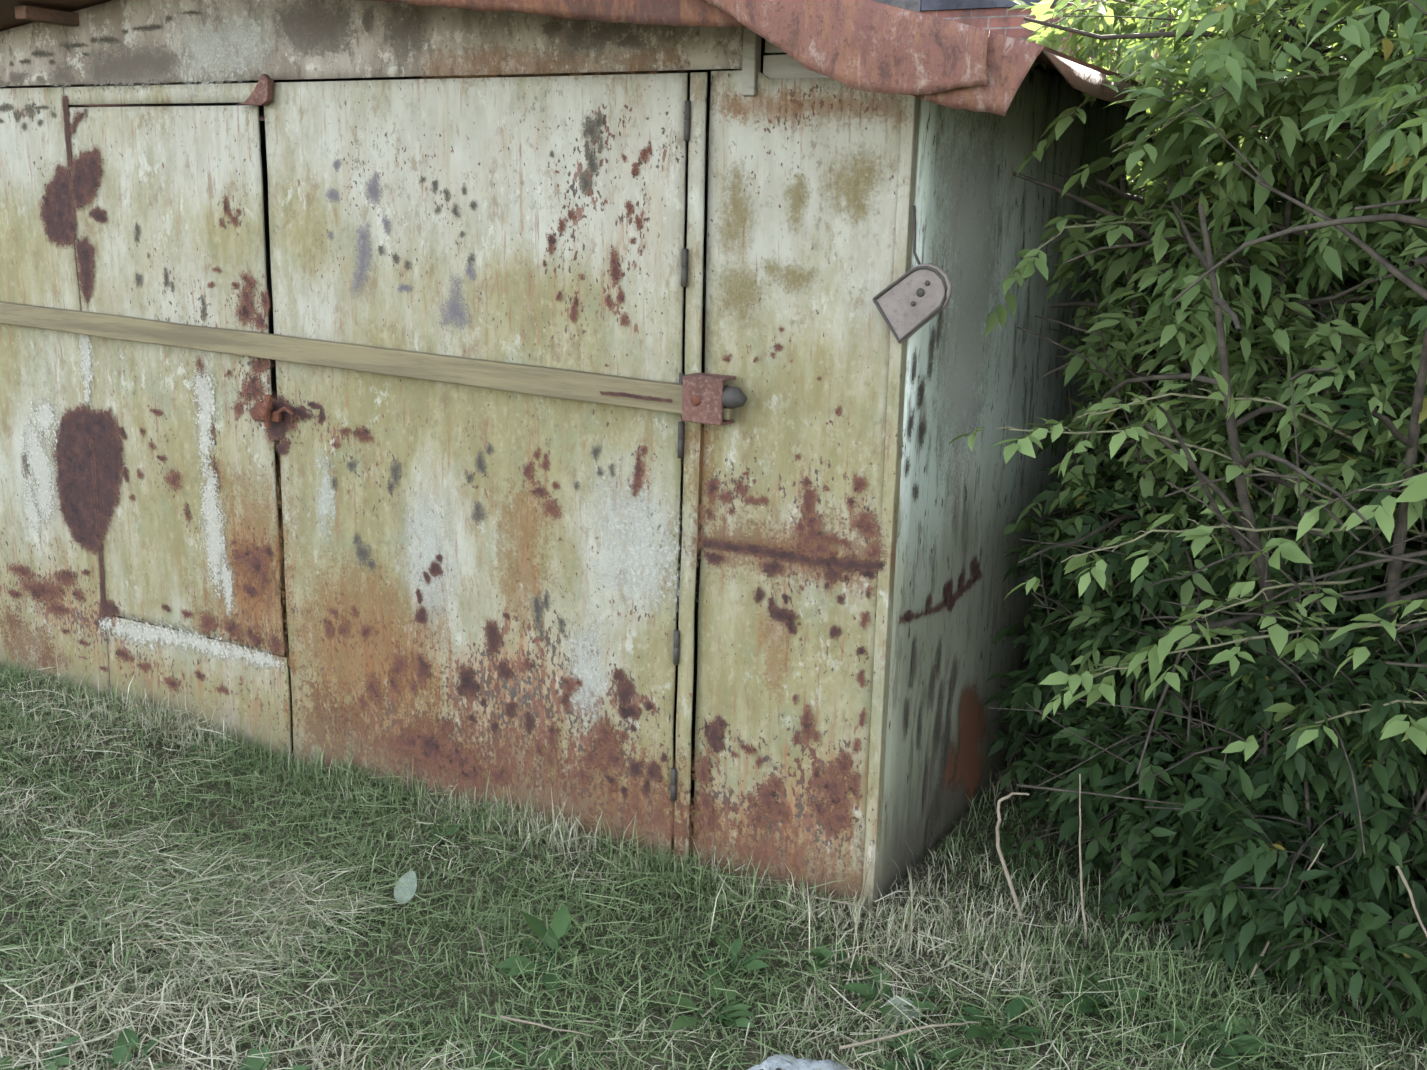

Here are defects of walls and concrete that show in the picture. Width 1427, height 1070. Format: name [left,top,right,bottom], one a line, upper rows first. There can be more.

rust [621,145,652,178]
rust [543,210,576,267]
rust [625,201,642,244]
rust [226,357,325,455]
rust [331,425,373,488]
rust [415,554,443,624]
rust [698,471,885,688]
rust [899,556,982,624]
rust [485,613,533,680]
rust [392,664,582,791]
rust [576,668,667,799]
rust [704,716,789,829]